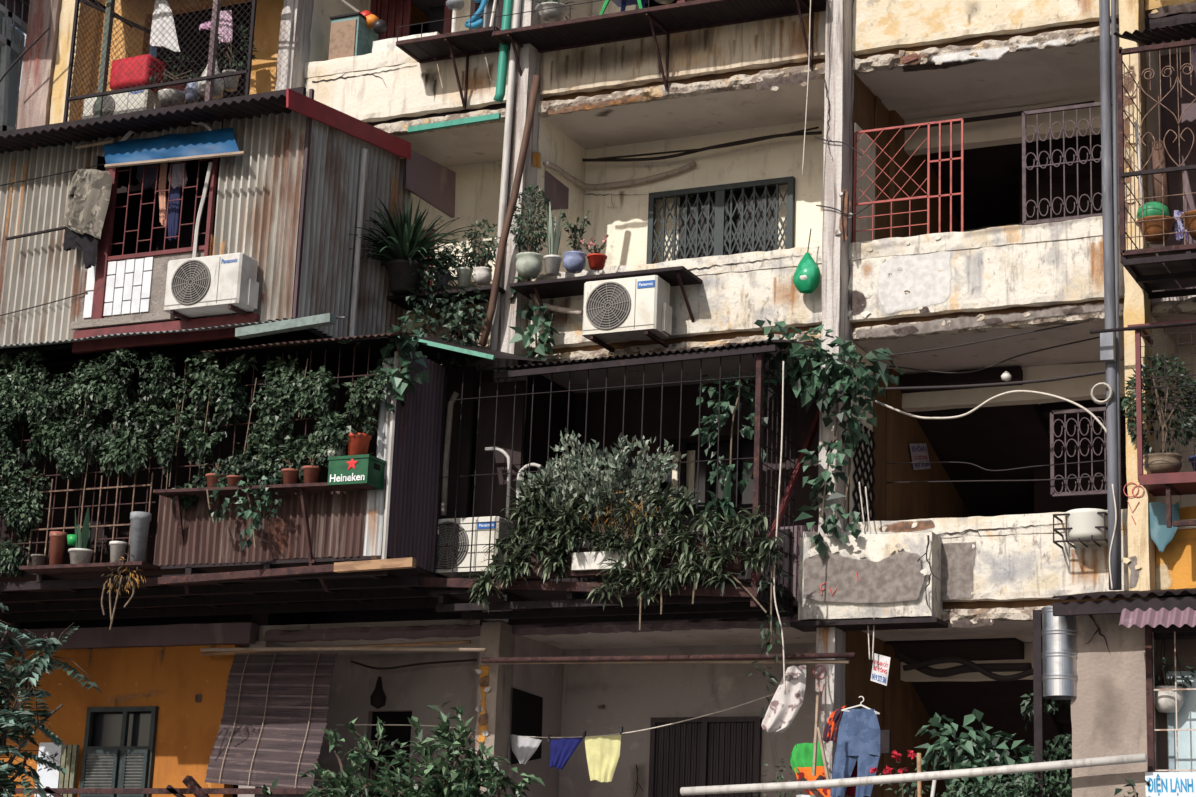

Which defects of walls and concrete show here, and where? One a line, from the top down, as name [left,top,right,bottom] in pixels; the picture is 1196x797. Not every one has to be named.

spalling [899,35,1088,72]
spalling [547,95,642,115]
spalling [756,69,819,91]
rust [0,159,26,298]
rust [71,265,87,316]
peeling [848,236,1104,338]
spalling [802,520,976,603]
crack [917,523,1065,610]
spalling [950,617,994,628]